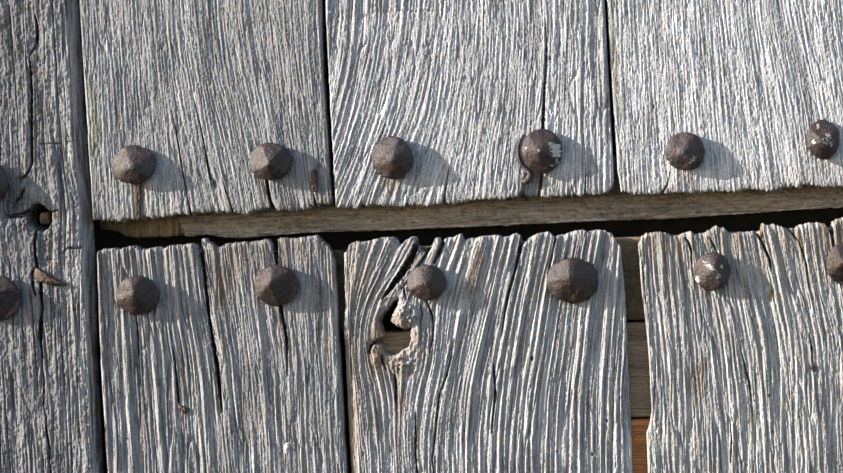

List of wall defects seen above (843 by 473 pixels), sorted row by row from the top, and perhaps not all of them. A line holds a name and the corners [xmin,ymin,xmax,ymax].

crack [540,26,548,129]
crack [7,15,77,473]
crack [200,247,223,409]
crack [381,242,454,473]